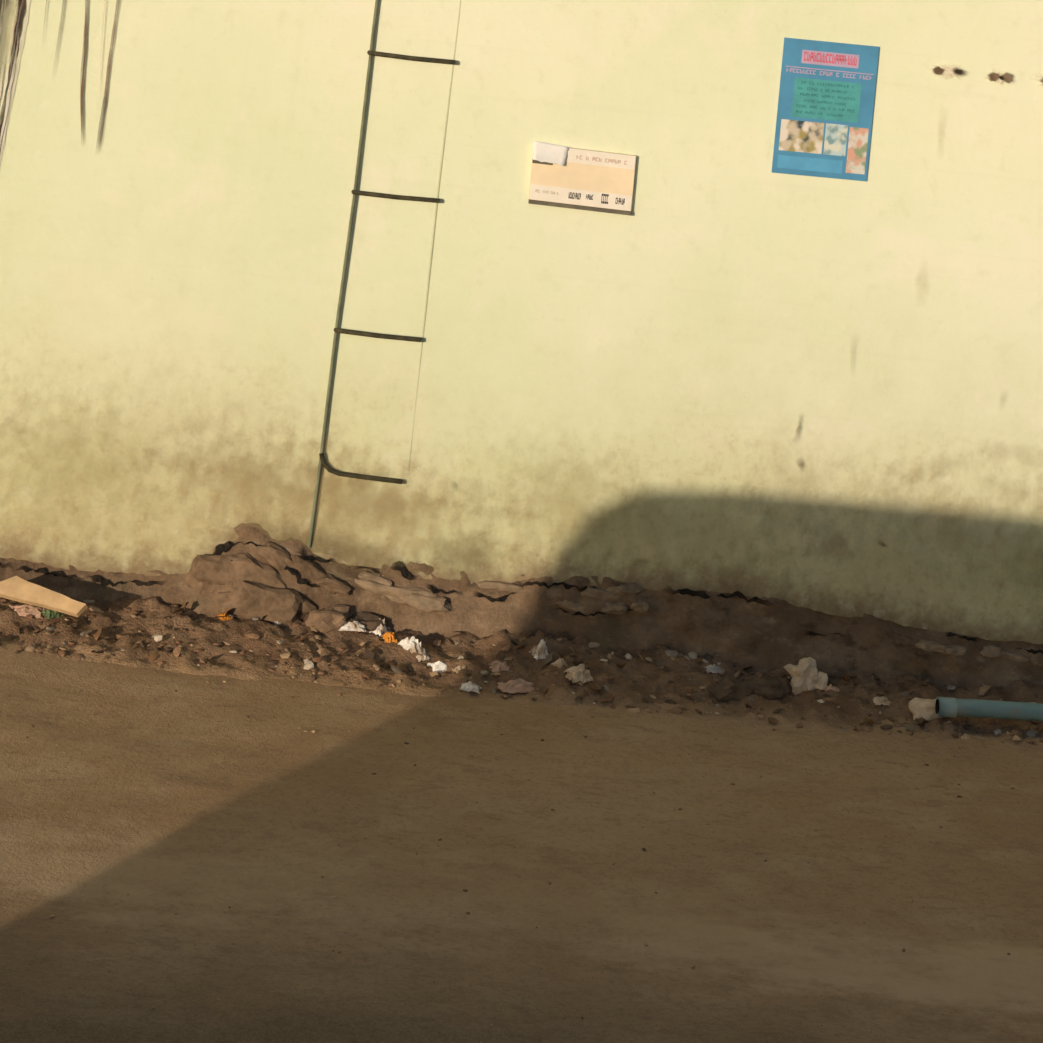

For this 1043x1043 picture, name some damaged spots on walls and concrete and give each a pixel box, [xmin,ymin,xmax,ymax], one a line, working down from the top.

spalling [933,67,964,77]
spalling [988,72,1013,83]